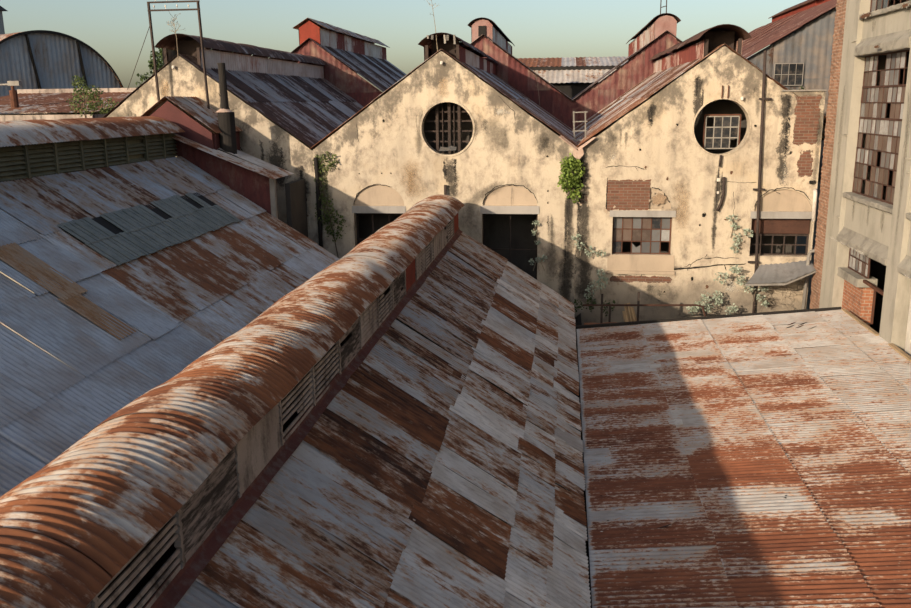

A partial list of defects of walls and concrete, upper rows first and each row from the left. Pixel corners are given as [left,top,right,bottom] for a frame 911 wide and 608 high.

rust [0,242,136,340]
damp [443,159,459,197]
damp [559,157,592,303]
flaking render [604,165,666,214]
damp [693,76,704,124]
crack [674,255,744,271]
damp [776,94,792,185]
spalling [788,0,847,309]